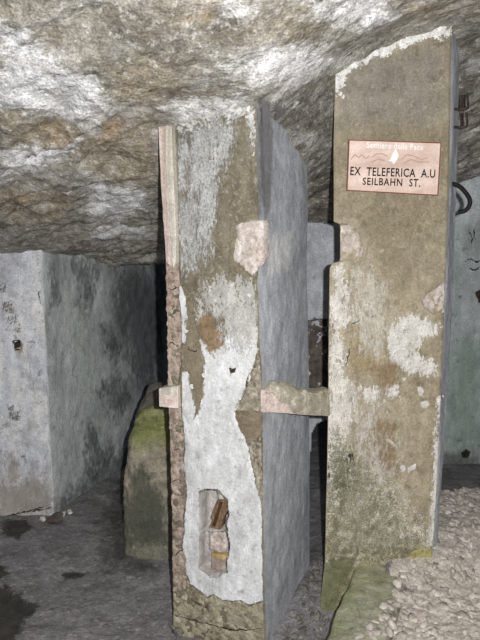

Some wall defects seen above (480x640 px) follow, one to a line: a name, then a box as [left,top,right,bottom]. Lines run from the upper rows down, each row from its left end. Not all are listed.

peeling [165,214,270,640]